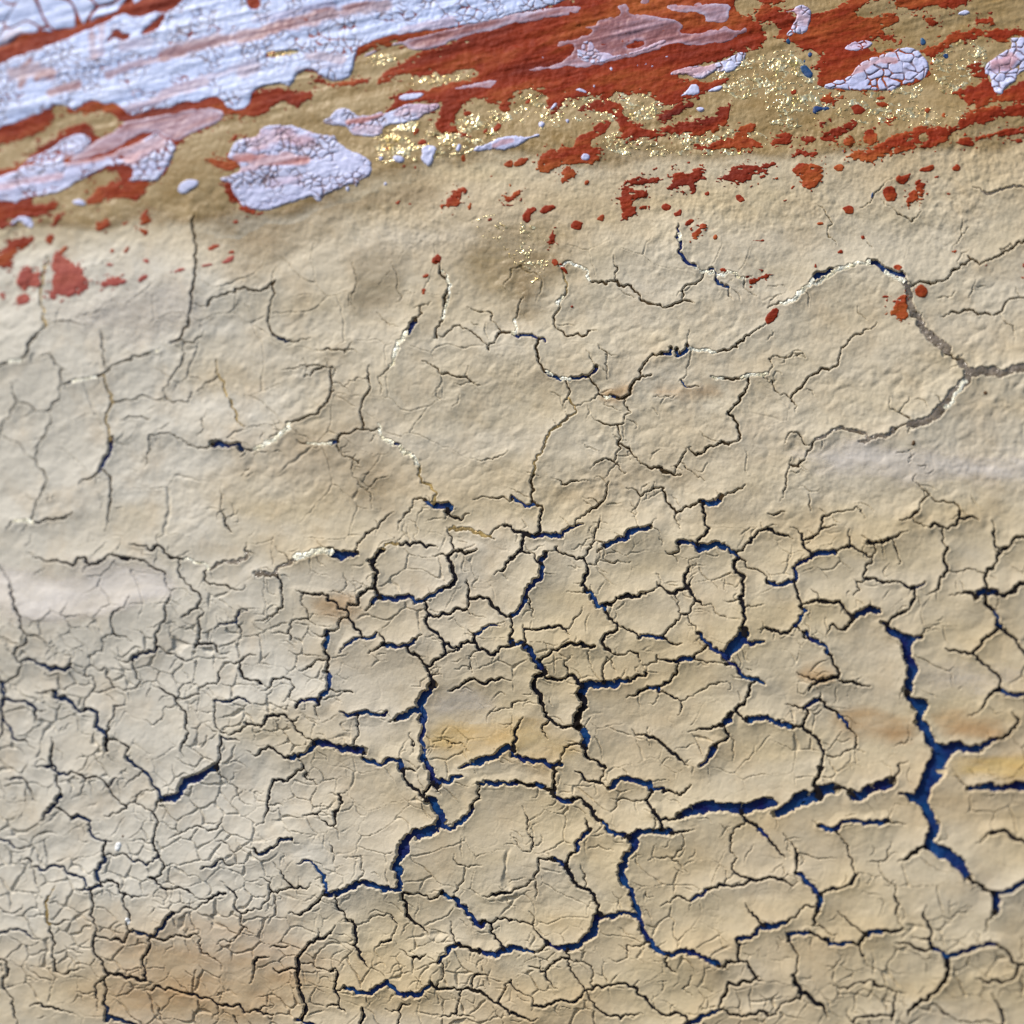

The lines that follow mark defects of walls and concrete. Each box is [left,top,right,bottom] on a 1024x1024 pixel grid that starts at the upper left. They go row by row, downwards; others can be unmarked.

peeling [0,0,140,46]
peeling [786,5,811,36]
peeling [577,40,666,64]
peeling [671,52,746,79]
peeling [824,40,929,91]
peeling [985,37,1024,95]
peeling [399,93,423,101]
peeling [474,134,539,152]
peeling [221,125,372,211]
crack [973,185,1024,195]
crack [0,216,1024,1024]